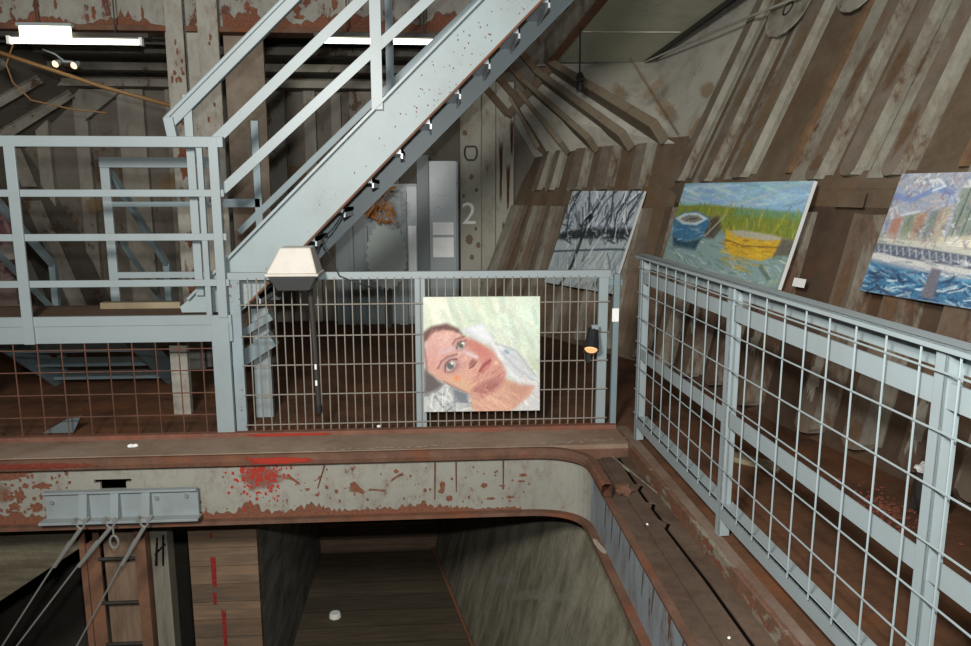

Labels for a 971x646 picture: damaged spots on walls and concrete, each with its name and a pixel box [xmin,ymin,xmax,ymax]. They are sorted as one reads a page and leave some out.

peeling [0,0,156,25]
peeling [222,0,266,27]
peeling [277,0,394,29]
peeling [405,11,457,30]
spalling [96,479,131,488]
spalling [350,472,403,495]
spalling [0,529,112,646]
spalling [172,526,196,646]